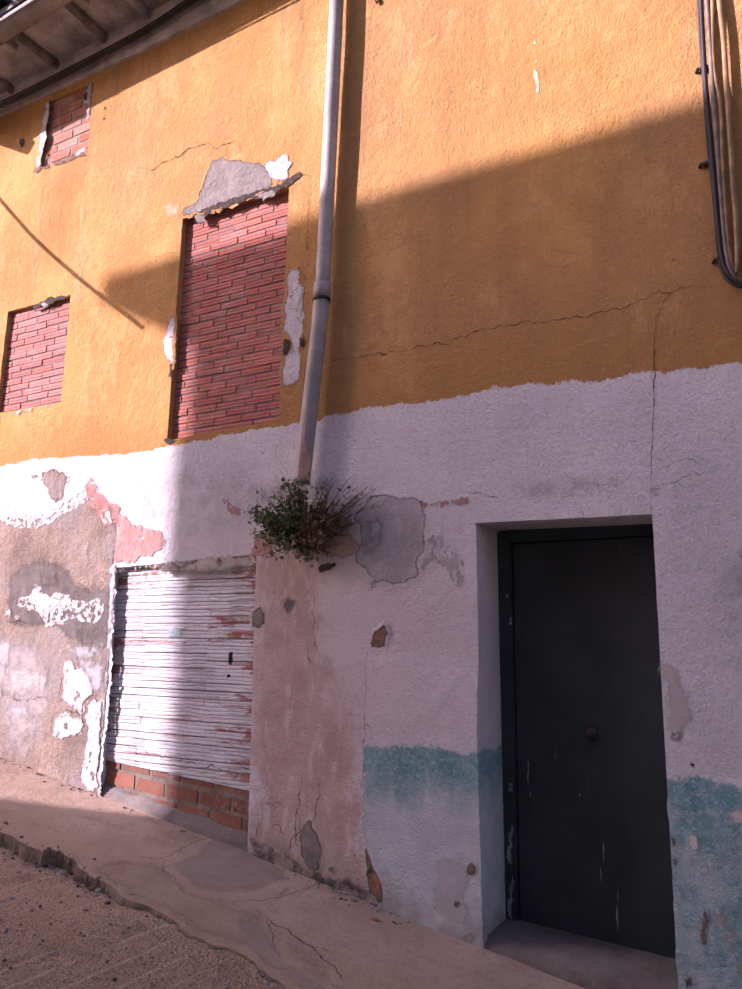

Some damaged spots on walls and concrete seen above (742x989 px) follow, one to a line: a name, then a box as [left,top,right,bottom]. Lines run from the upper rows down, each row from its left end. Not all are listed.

crack [147,140,241,171]
flaking render [168,153,302,223]
peeling [279,264,308,391]
crack [332,286,722,500]
peeling [421,497,469,509]
peeling [421,535,464,587]
peeling [0,465,270,797]
flaking render [368,621,392,653]
crack [256,777,320,863]
crack [123,838,342,979]
flaking render [365,849,382,903]